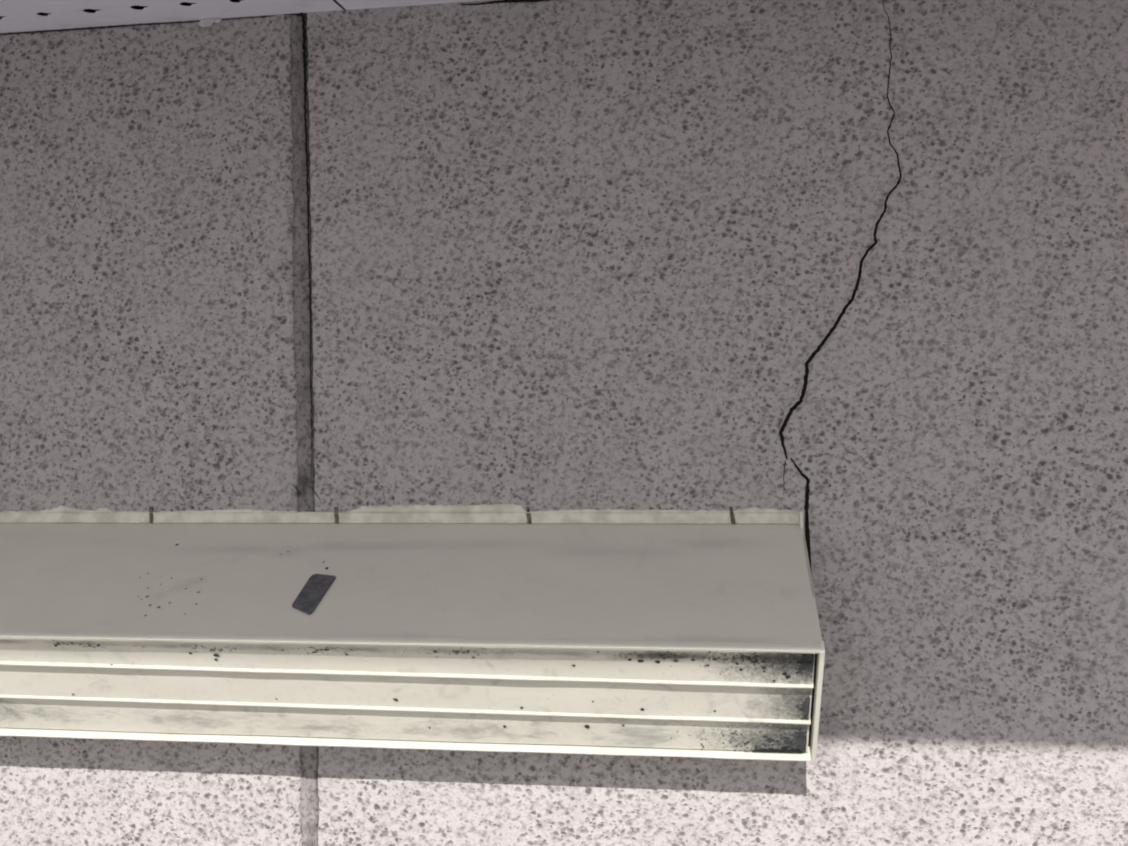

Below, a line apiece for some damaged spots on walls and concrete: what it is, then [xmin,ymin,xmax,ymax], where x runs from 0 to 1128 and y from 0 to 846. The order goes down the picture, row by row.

crack [776,1,904,509]